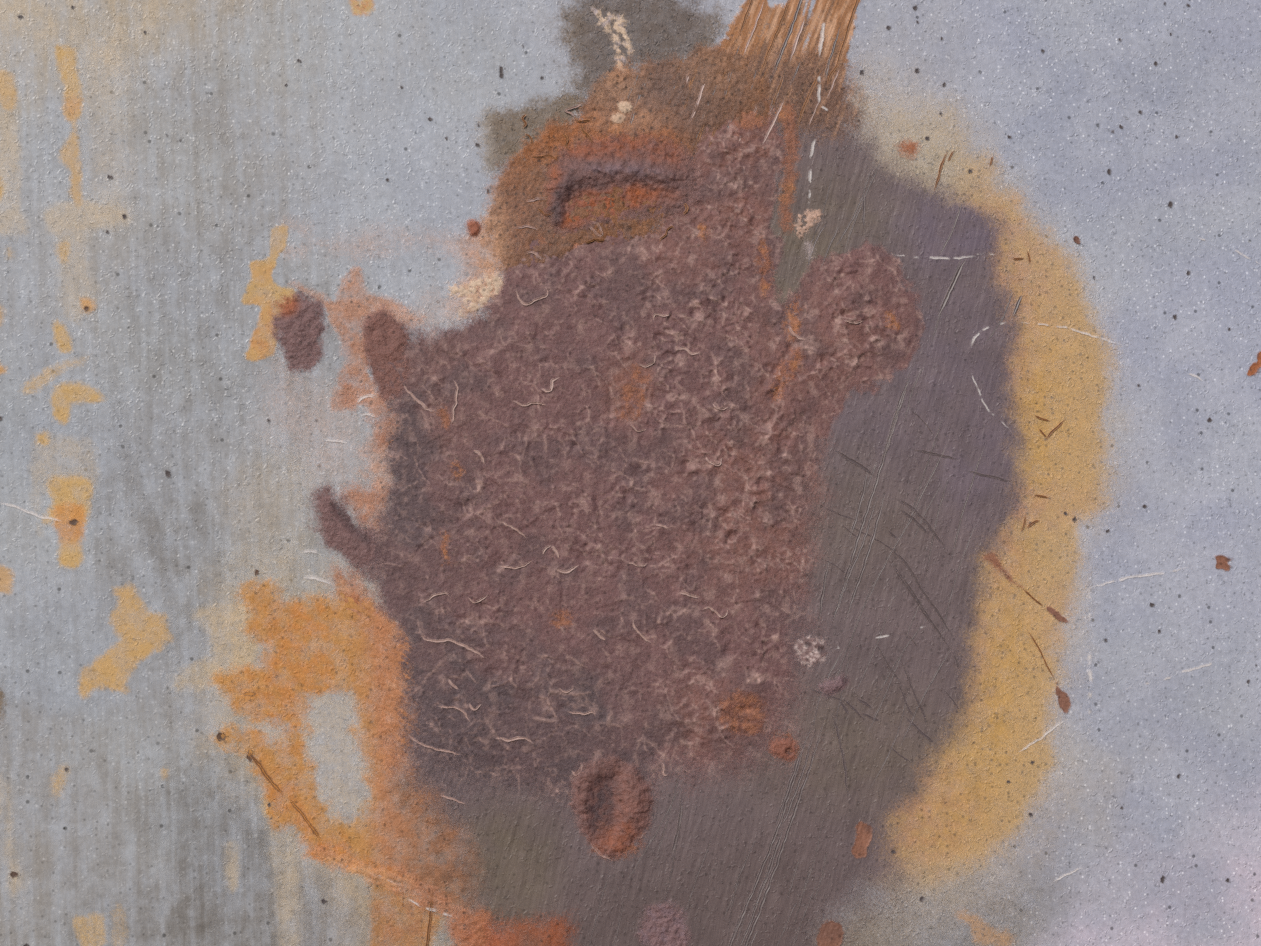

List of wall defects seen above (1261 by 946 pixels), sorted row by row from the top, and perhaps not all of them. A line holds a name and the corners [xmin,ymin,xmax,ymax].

corrosion [56,47,81,200]
damp [478,0,721,170]
corrosion [53,385,99,422]
corrosion [213,0,1108,946]
corrosion [0,567,11,592]
corrosion [80,587,165,695]